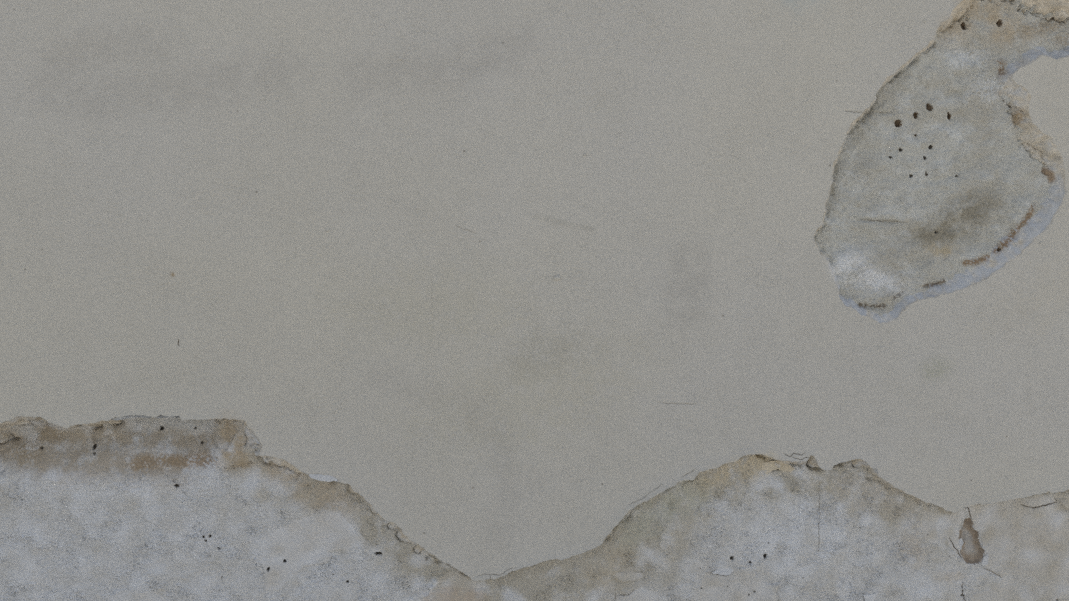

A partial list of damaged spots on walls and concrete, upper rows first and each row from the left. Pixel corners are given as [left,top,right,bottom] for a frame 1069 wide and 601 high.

spalling [813,45,1045,324]
spalling [0,455,1069,601]